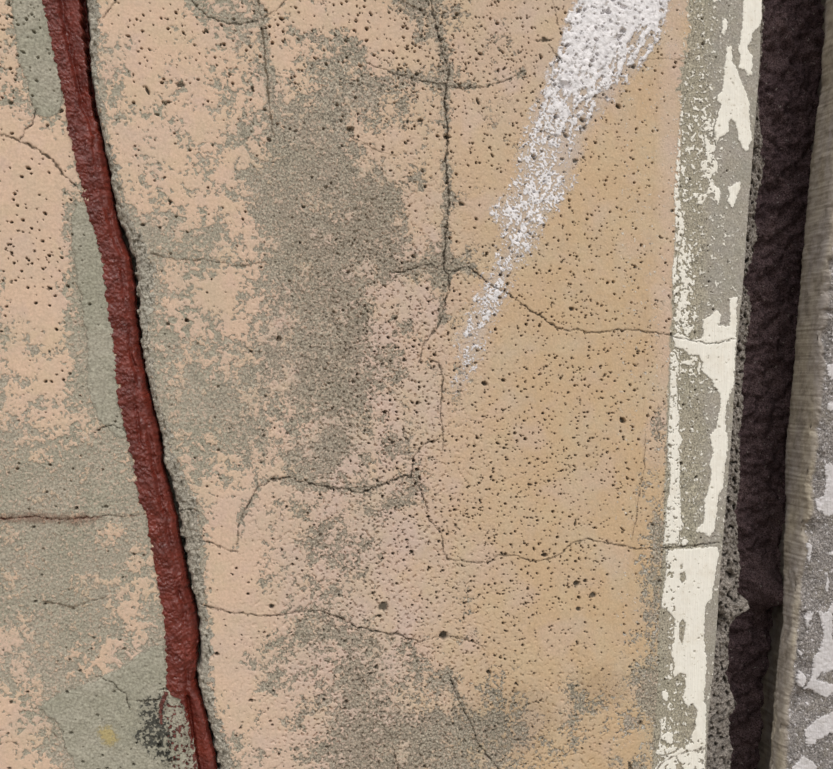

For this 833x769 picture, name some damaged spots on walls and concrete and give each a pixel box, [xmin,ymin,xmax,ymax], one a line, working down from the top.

crack [1,0,471,769]
crack [237,0,688,563]
peeling [475,18,528,130]
leakage [450,0,670,387]
peeling [723,165,741,209]
peeling [787,326,833,769]